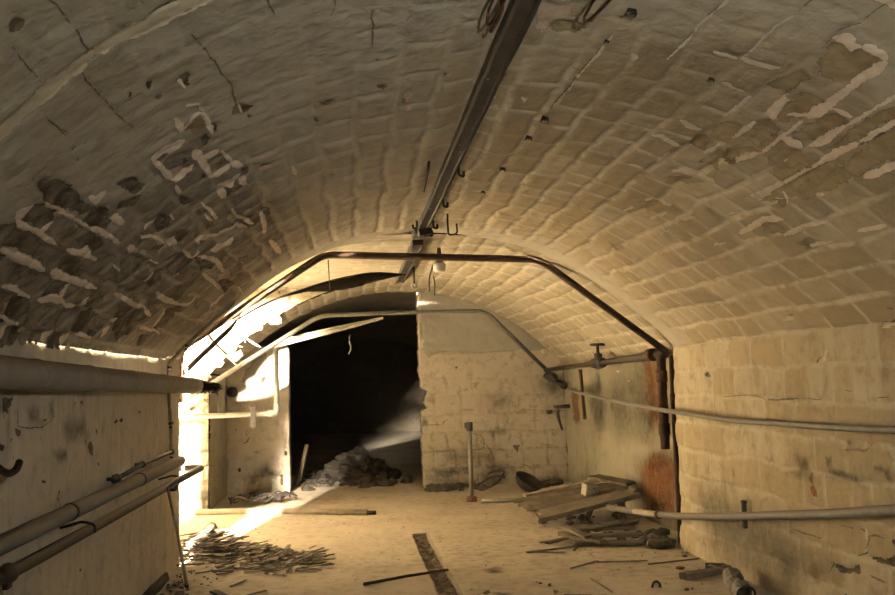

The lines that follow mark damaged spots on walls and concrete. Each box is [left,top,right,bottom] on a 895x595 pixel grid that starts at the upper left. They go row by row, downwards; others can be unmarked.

peeling [0,0,212,141]
peeling [535,0,585,33]
peeling [651,33,895,249]
peeling [0,103,282,350]
rust [645,361,659,425]
rust [640,454,675,512]